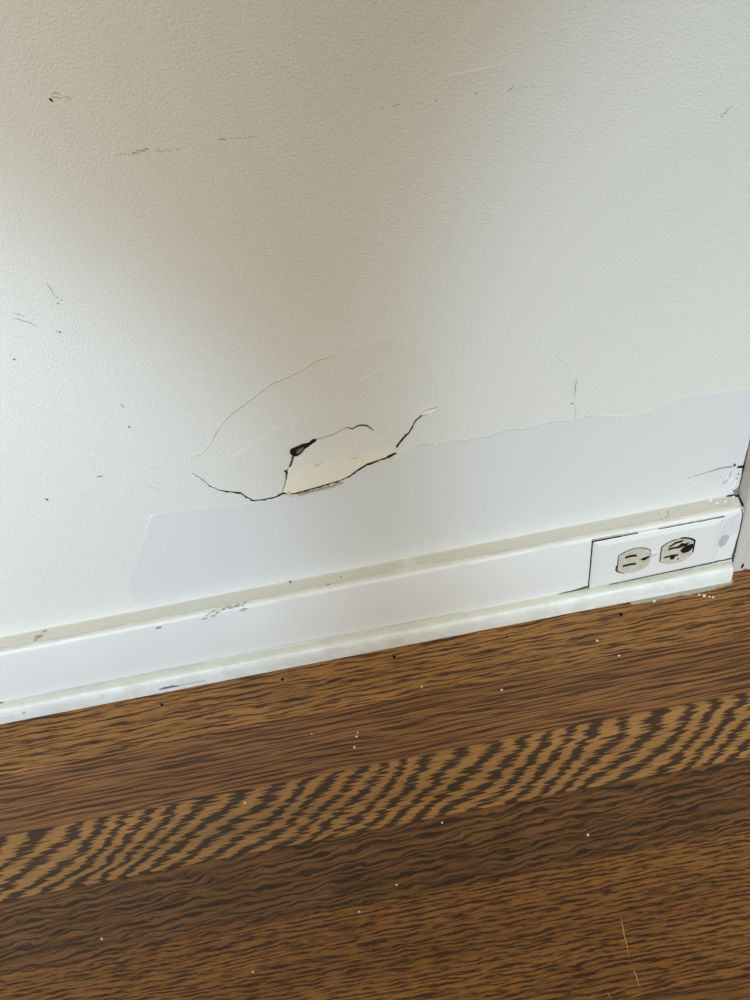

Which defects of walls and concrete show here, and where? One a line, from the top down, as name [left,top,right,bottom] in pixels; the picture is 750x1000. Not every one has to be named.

crack [191,355,428,501]
peeling [283,439,399,498]